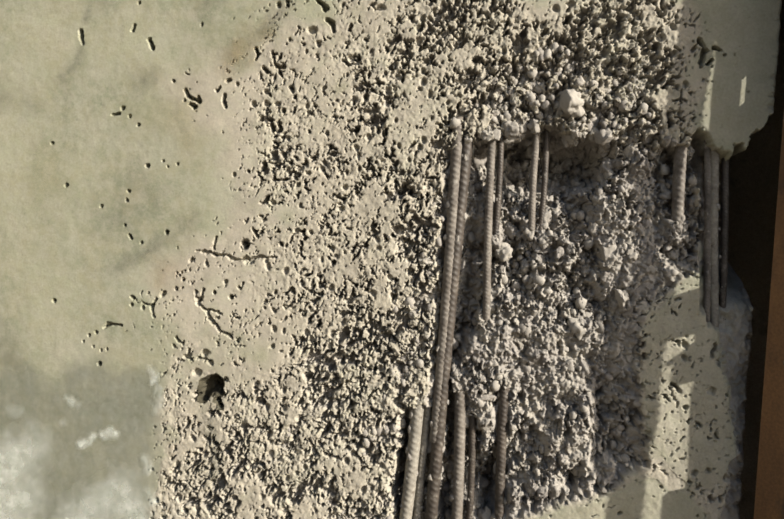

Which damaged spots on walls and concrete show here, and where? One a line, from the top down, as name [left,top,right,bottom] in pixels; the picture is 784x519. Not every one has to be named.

crack [193,287,234,340]
crack [195,235,278,268]
spalling [362,42,754,519]
water stain [0,370,157,519]